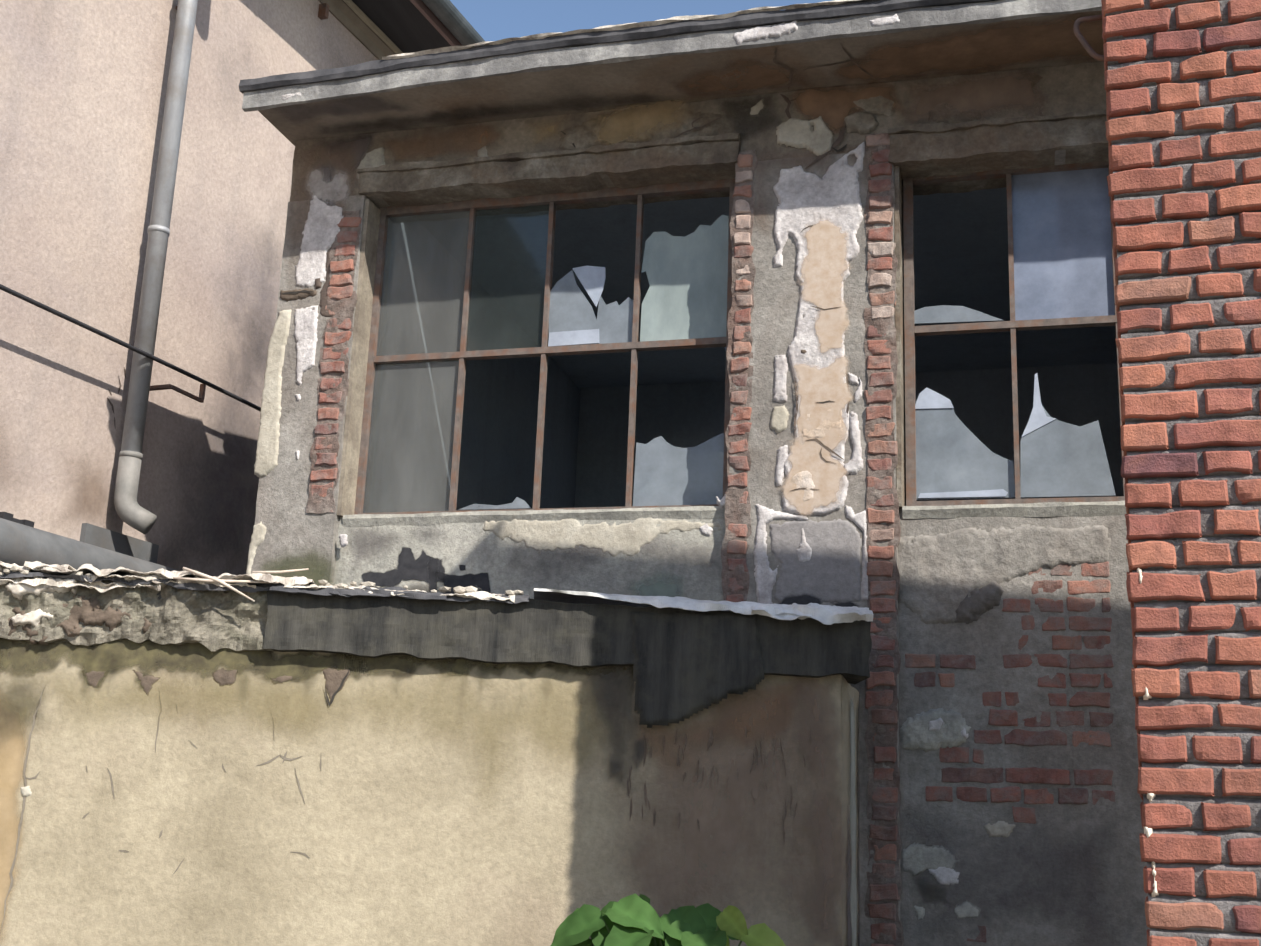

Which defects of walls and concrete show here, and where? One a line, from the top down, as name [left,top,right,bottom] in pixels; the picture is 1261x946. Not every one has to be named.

flaking render [254,147,385,514]
spalling [5,577,152,645]
peeling [246,521,266,575]
flaking render [483,96,976,946]
damp [0,638,645,775]
flaking render [925,561,1115,838]
peeling [954,900,986,943]